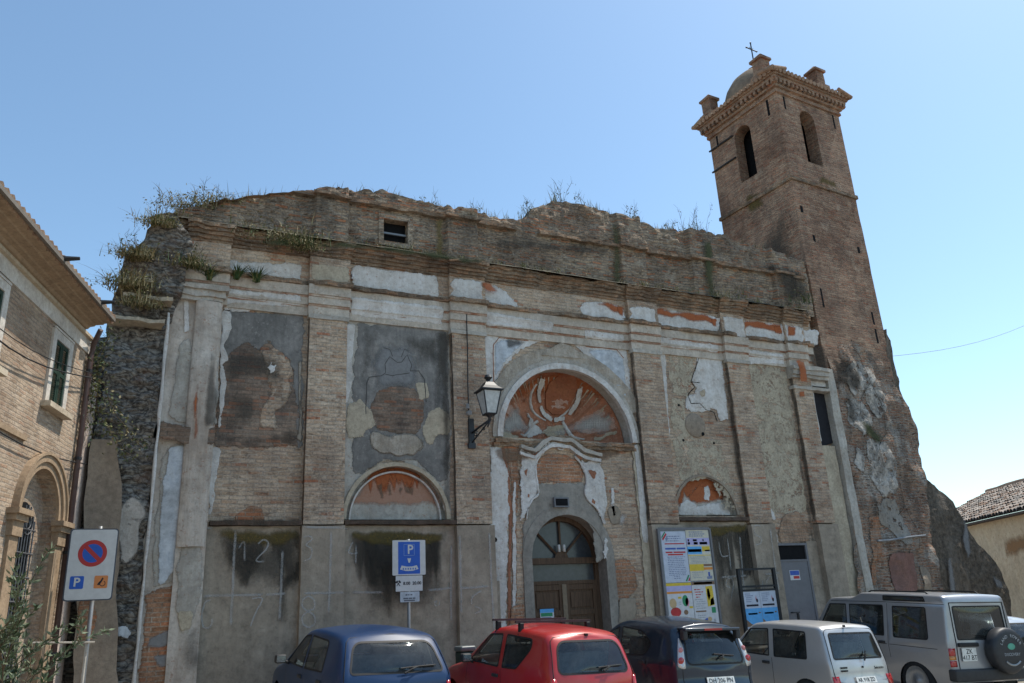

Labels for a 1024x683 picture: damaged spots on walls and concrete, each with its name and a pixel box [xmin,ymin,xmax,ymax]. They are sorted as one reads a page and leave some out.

flaking render [119,300,204,683]
flaking render [207,289,305,515]
damp [226,534,299,593]
flaking render [230,260,554,513]
damp [354,538,439,601]
flaking render [490,413,615,627]
flaking render [575,301,819,543]